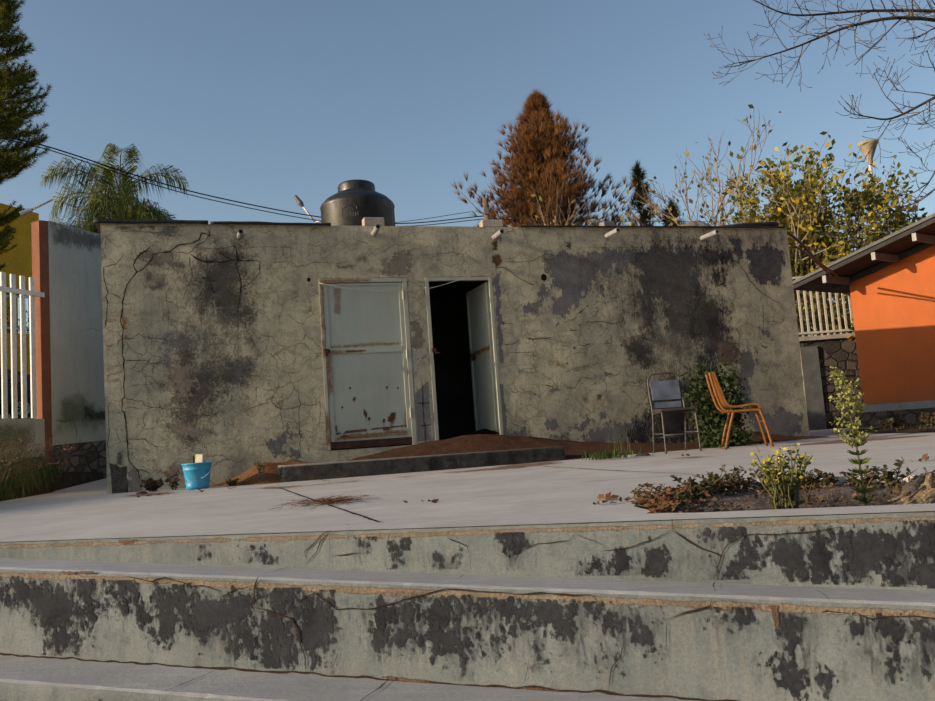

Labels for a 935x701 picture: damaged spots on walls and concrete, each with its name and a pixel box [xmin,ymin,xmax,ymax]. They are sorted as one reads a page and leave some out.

crack [503,234,675,388]
crack [712,257,783,366]
crack [87,230,348,479]
corrosion [322,340,398,391]
peeling [265,423,303,458]
corrosion [327,409,407,444]
leakage [577,535,672,577]
leakage [697,520,935,588]
leakage [0,576,341,674]
leakage [357,594,665,677]
leakage [757,610,838,701]
leakage [838,613,935,684]